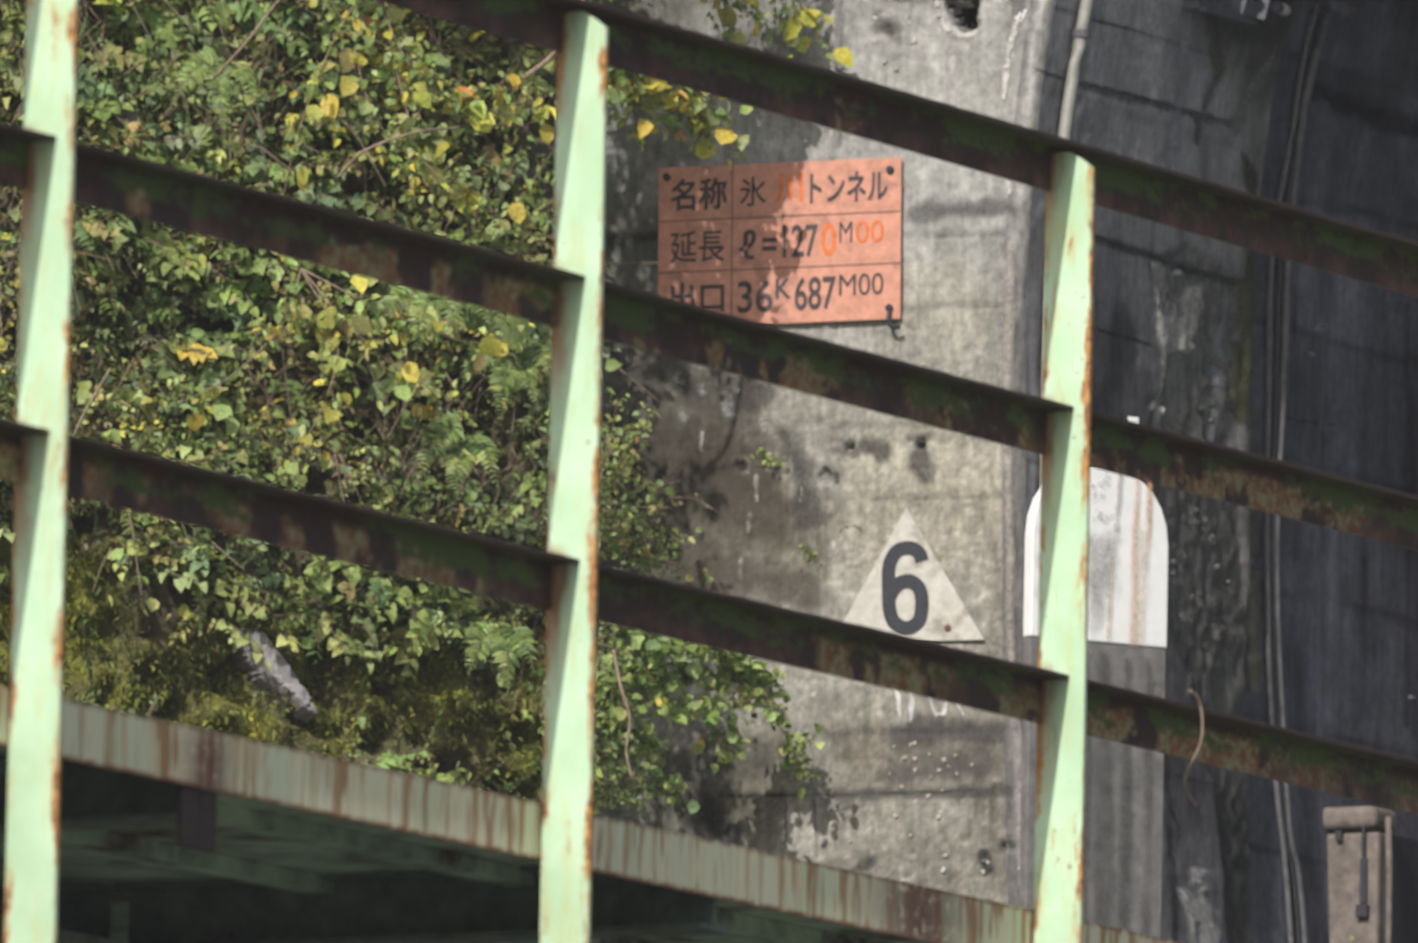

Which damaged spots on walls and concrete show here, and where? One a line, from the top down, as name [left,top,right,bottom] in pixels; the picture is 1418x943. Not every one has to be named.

spalling [934,0,981,38]